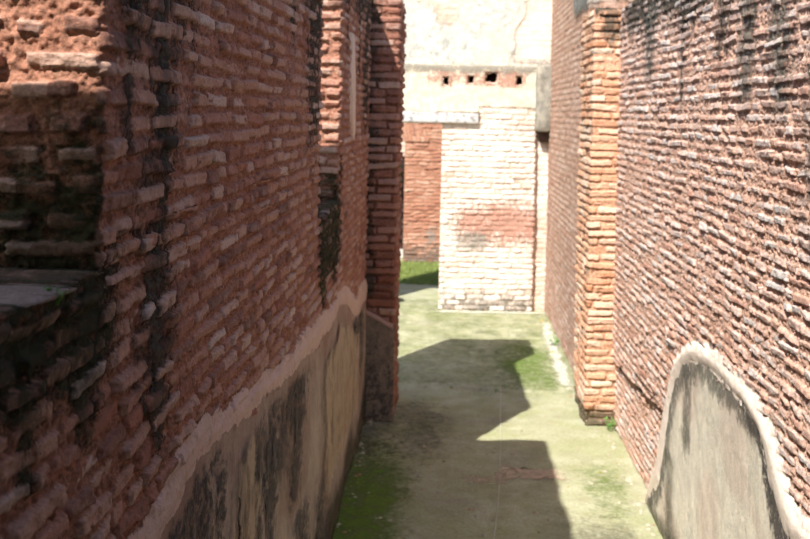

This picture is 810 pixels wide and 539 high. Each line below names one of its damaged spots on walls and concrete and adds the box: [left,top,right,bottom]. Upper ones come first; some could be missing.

flaking render [402,0,536,113]
leakage [573,0,758,114]
leakage [766,0,798,116]
leakage [0,0,199,489]
leakage [169,451,227,539]
leakage [247,369,377,539]
leakage [648,361,790,539]